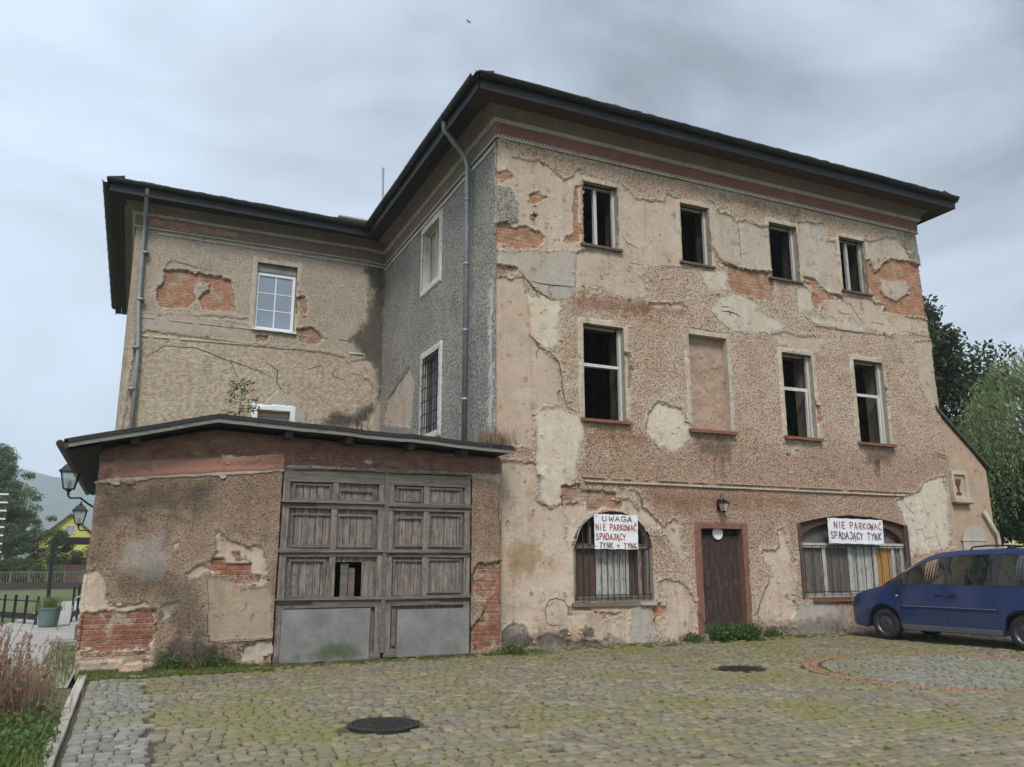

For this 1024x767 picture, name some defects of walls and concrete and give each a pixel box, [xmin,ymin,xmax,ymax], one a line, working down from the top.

crack [147,341,285,393]
peeling [122,270,414,430]
water stain [349,265,384,392]
crack [530,335,579,412]
peeling [493,140,686,310]
crack [651,294,739,333]
peeling [706,199,774,302]
peeling [798,221,931,340]
crack [808,299,928,339]
peeling [390,457,699,651]
peeling [896,476,951,556]
flaking render [76,567,178,673]